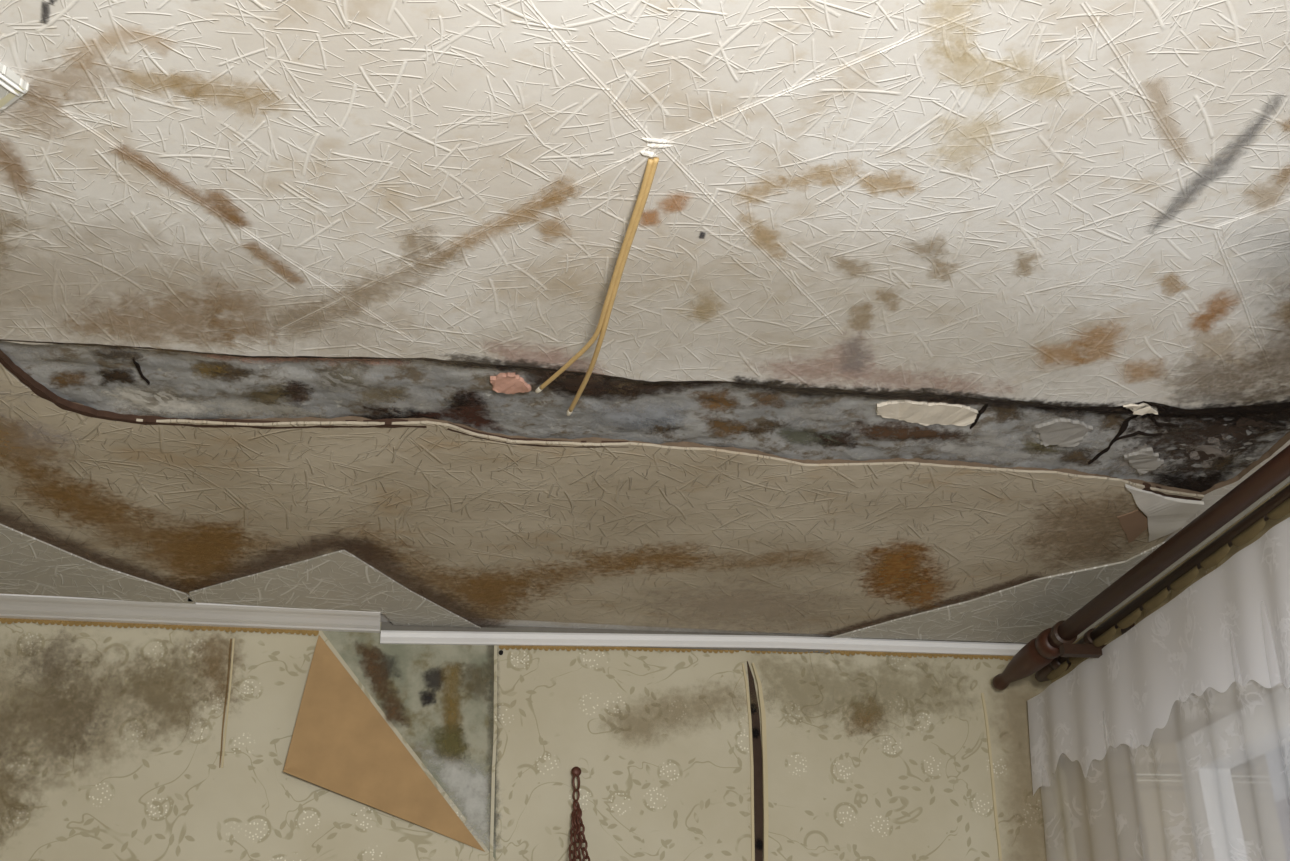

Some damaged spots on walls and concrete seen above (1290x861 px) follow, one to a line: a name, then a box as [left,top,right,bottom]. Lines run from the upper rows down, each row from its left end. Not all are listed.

water stain [0,150,25,188]
water stain [119,149,240,222]
water stain [1163,119,1263,218]
water stain [45,485,238,585]
peeling [0,341,1290,635]
flaking render [322,626,496,860]